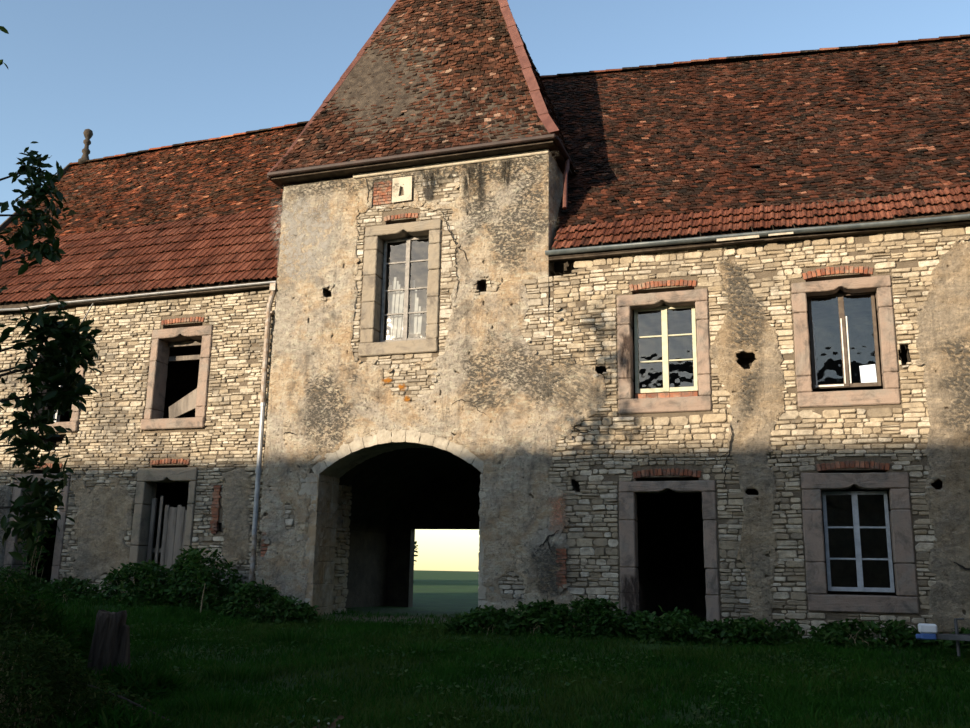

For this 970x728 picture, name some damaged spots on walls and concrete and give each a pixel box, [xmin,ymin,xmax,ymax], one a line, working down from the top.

spalling [351,173,461,401]
spalling [470,275,502,297]
peeling [519,260,610,610]
peeling [709,259,786,628]